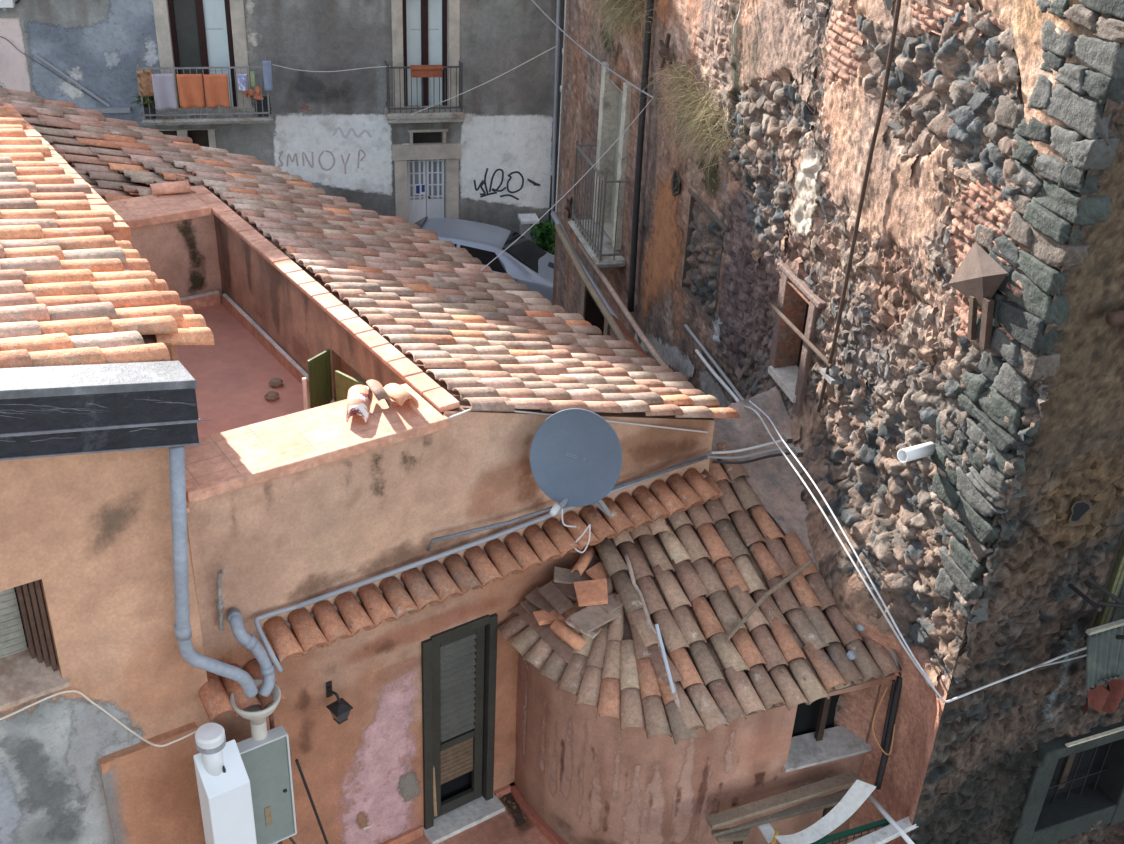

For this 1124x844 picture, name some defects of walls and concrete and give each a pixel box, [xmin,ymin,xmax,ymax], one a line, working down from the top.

crack [797,0,831,136]
spalling [718,68,823,266]
spalling [790,0,1124,689]
flaking render [0,694,143,844]
flaking render [340,673,420,844]
damp [539,699,735,844]